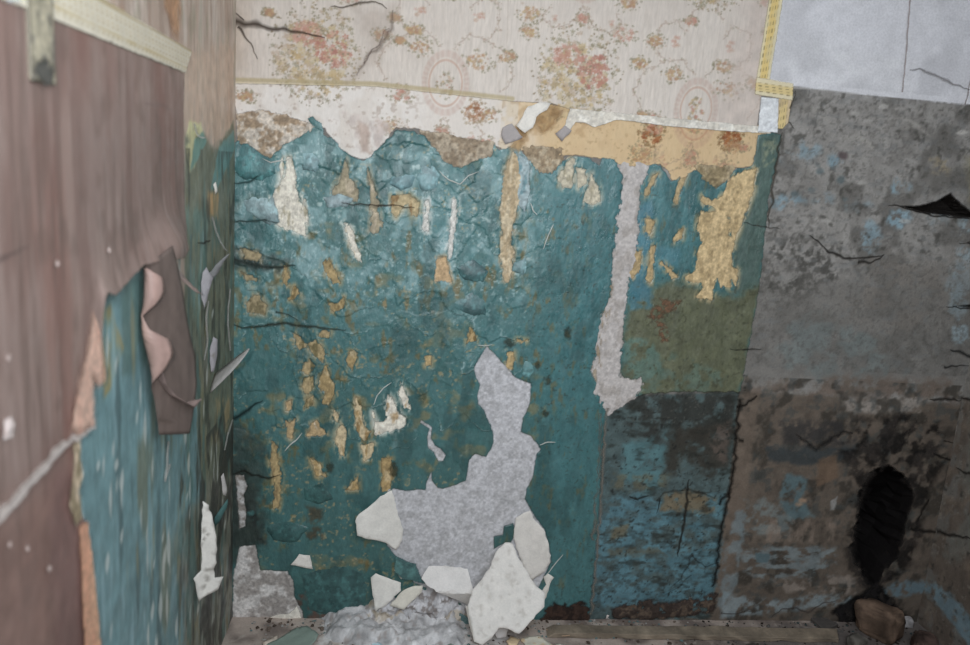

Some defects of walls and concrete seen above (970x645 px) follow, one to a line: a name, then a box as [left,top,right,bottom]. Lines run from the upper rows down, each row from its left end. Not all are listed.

crack [236,13,325,57]
peeling [210,116,623,645]
peeling [620,132,781,397]
crack [888,193,970,244]